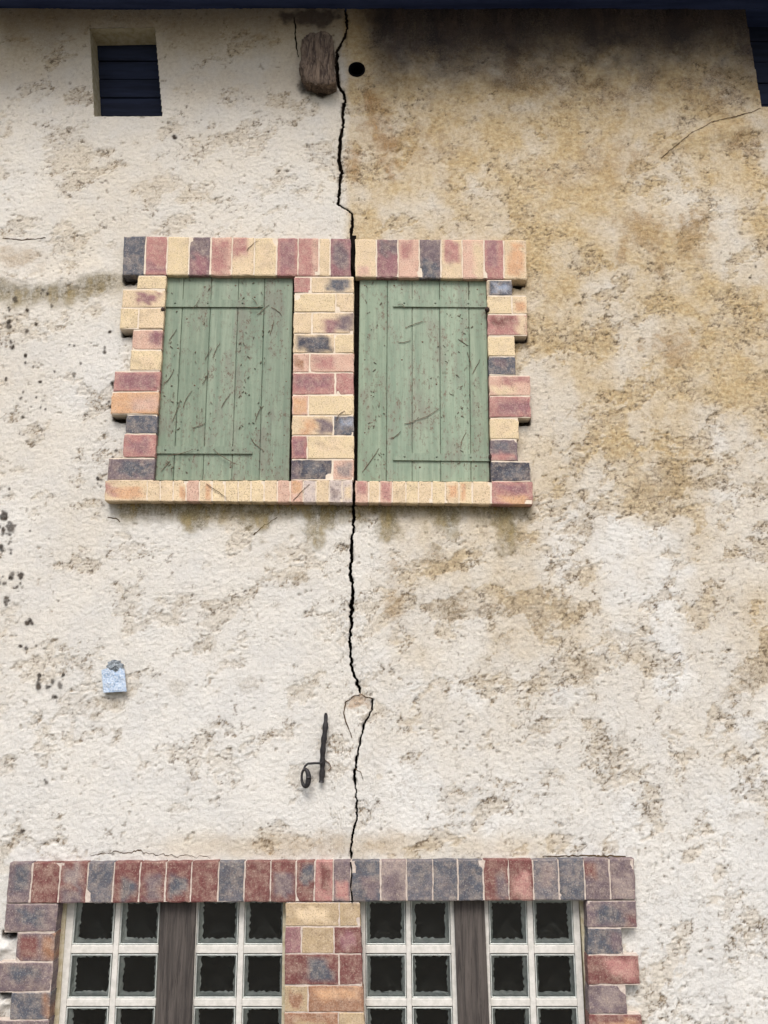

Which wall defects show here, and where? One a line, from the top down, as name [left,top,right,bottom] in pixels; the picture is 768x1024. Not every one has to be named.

crack [335,10,373,903]
crack [661,108,760,159]